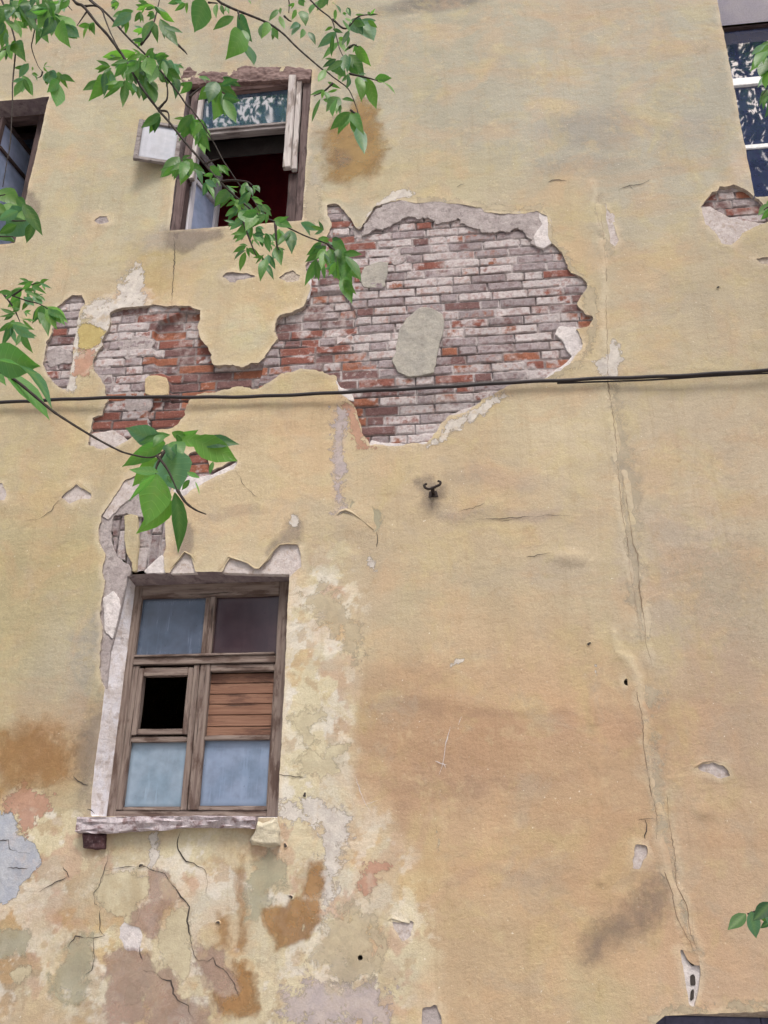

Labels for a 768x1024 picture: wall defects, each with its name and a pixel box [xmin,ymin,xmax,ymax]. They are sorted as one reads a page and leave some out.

damp [324,99,383,181]
spalling [701,184,768,245]
spalling [43,181,624,450]
spalling [169,451,237,496]
spalling [98,476,198,689]
peeling [217,541,302,577]
crack [549,177,708,966]
peeling [0,779,56,905]
crack [68,831,240,998]
peeling [274,790,413,1024]
crack [139,948,196,1024]
spalling [648,950,768,1023]